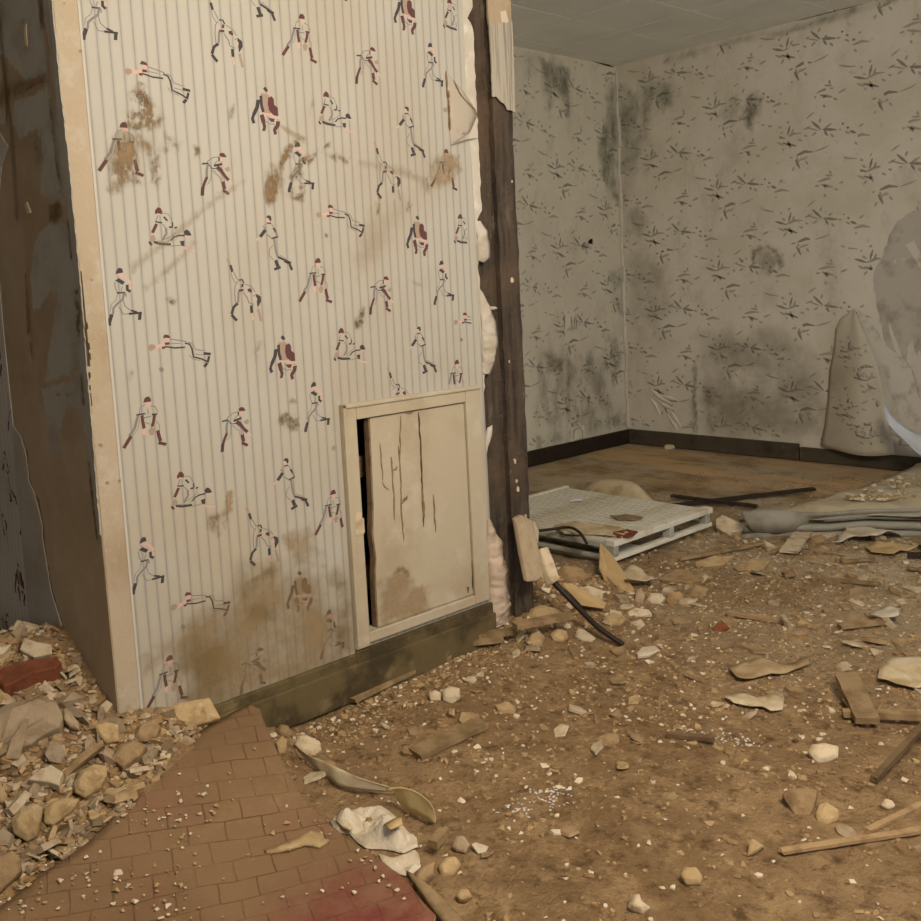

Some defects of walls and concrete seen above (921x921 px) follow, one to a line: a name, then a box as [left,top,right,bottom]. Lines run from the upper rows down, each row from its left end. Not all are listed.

peeling [0,0,67,207]
leakage [115,92,161,190]
peeling [857,209,921,434]
leakage [184,575,328,698]